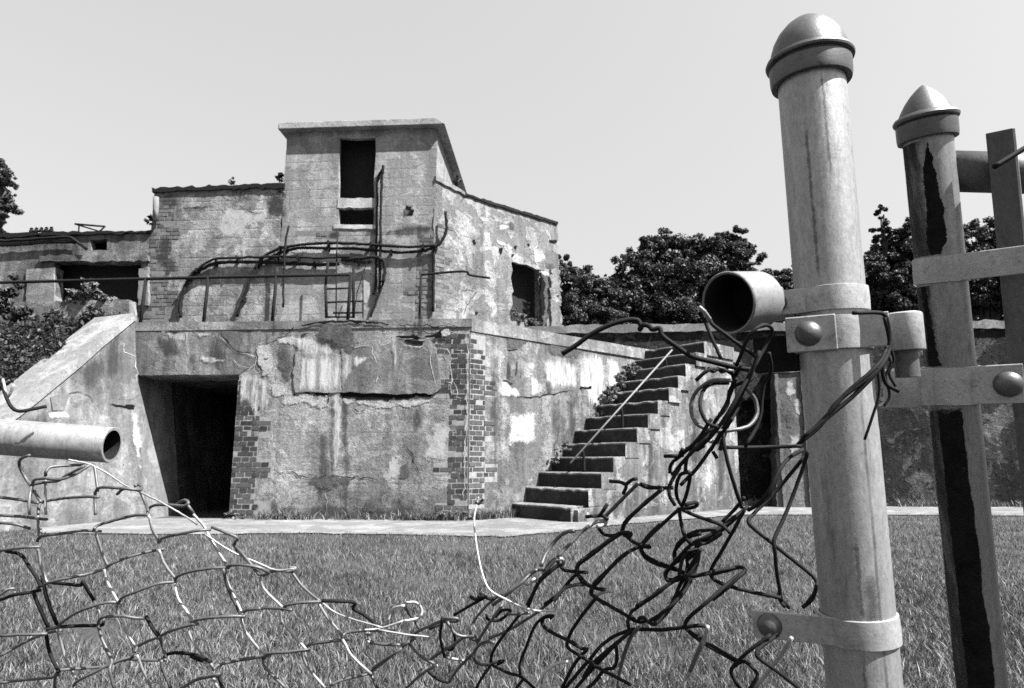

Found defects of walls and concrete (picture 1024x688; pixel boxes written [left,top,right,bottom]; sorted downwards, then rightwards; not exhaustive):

spalling [533,248,554,326]
crack [165,327,307,371]
peeling [423,420,458,460]
peeling [507,413,536,446]